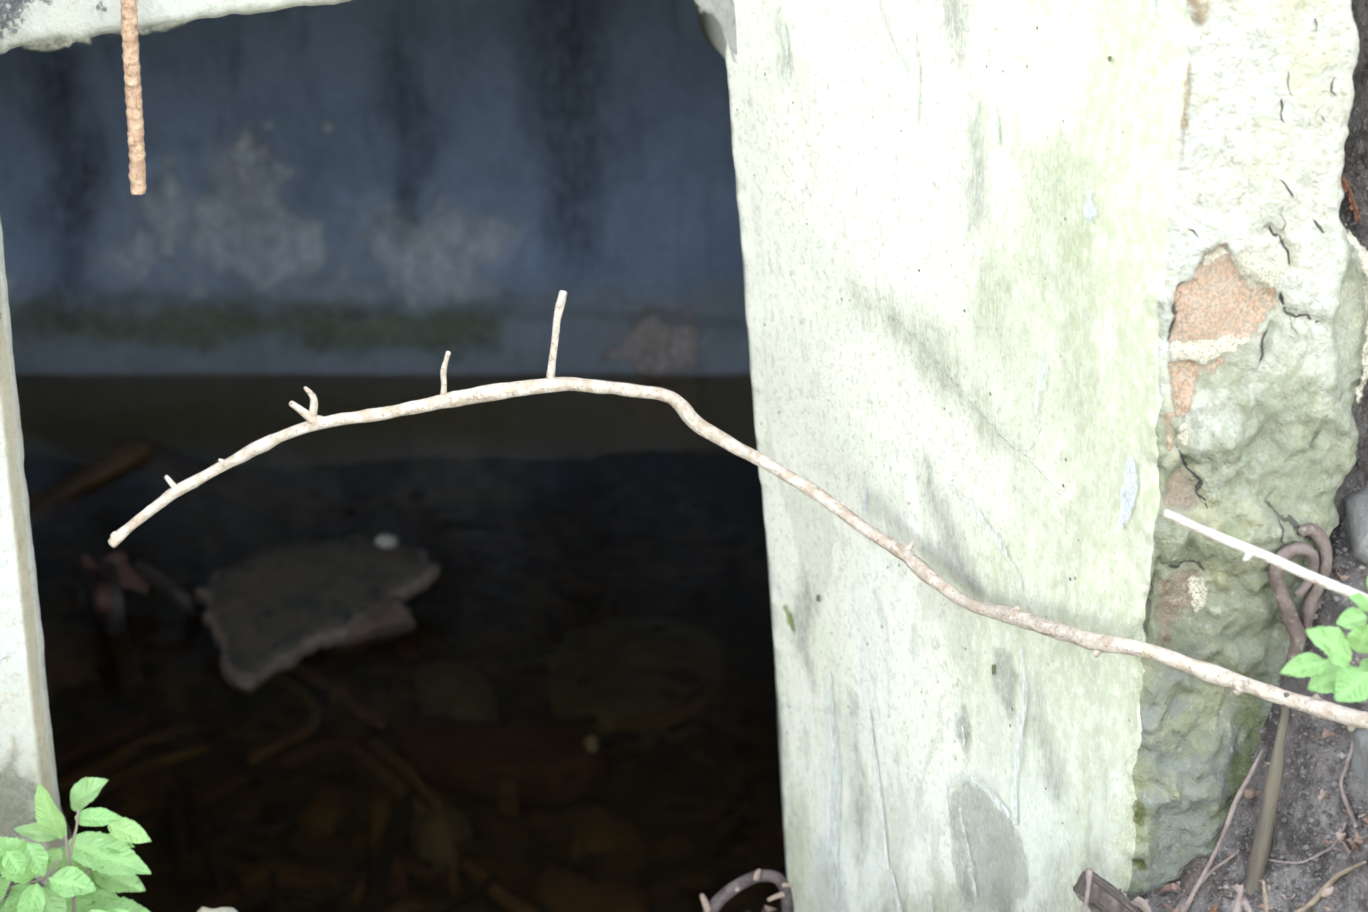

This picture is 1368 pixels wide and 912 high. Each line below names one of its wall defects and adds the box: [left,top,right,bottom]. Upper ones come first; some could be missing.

spalling [28,35,90,50]
water stain [112,133,324,291]
spalling [1164,244,1282,450]